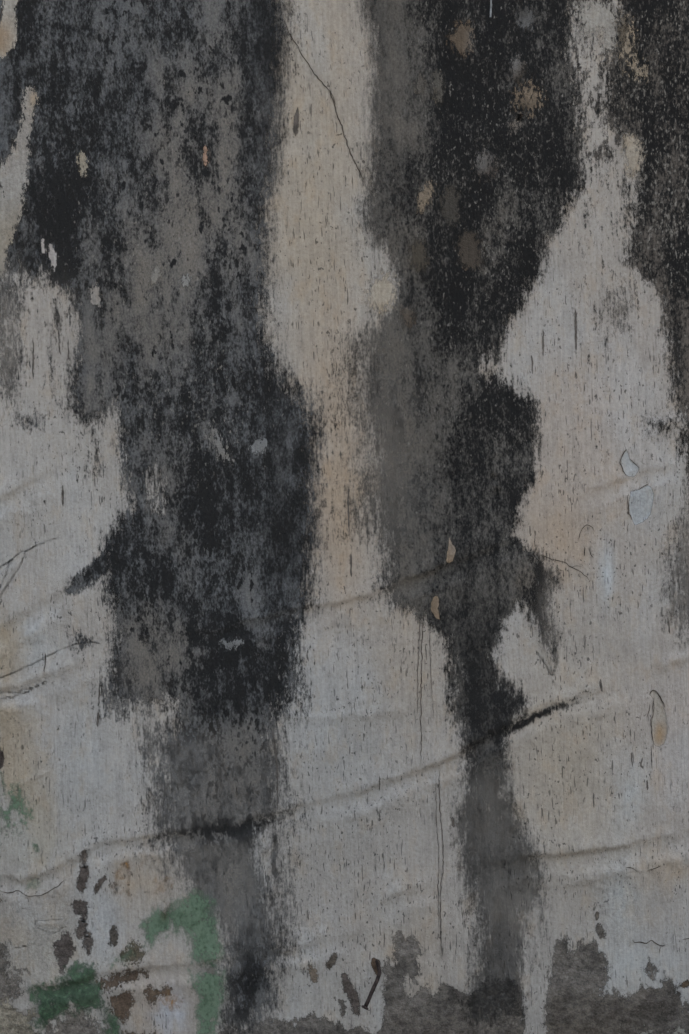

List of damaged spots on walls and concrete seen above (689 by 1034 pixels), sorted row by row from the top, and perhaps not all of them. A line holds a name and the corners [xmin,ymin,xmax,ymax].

damp [0,0,341,1034]
damp [329,0,689,1026]
spalling [53,850,107,976]
spalling [0,925,172,1034]
spalling [218,931,528,1034]
spalling [543,912,689,1034]